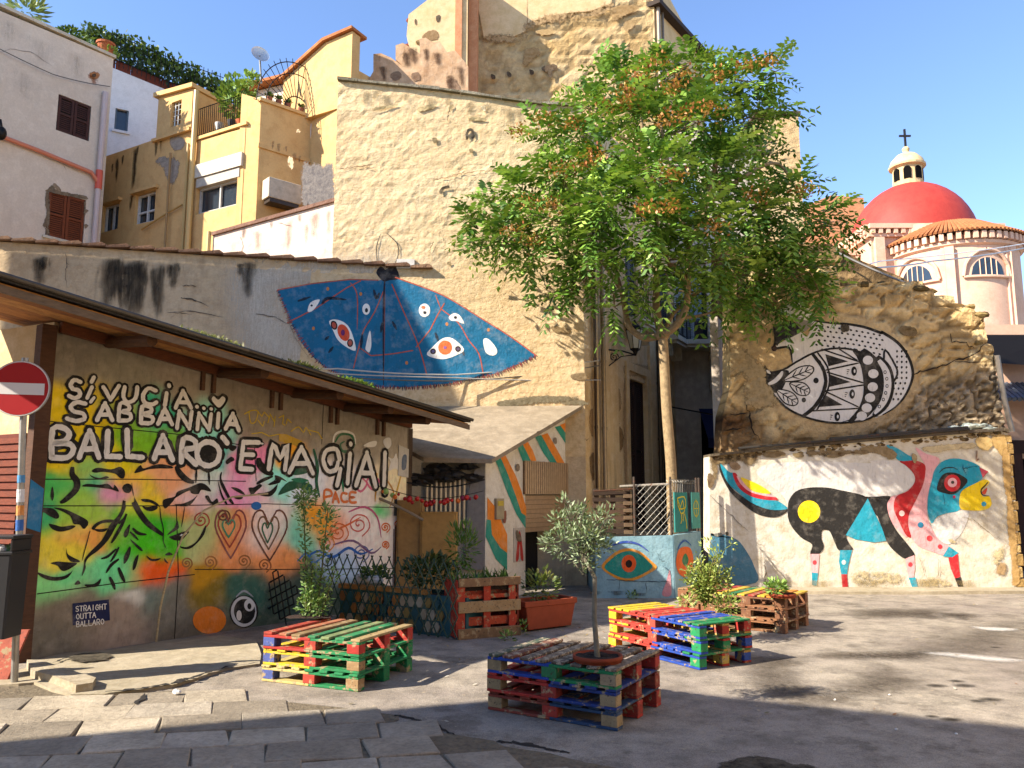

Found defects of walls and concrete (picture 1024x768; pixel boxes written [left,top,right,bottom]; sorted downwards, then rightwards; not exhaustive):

spalling [391,71,420,81]
damp [112,147,138,183]
spalling [156,136,185,185]
spalling [288,156,335,206]
spalling [43,183,88,235]
damp [35,257,45,280]
damp [104,260,177,310]
damp [239,264,252,291]
crack [913,334,996,392]
spalling [707,431,1020,587]